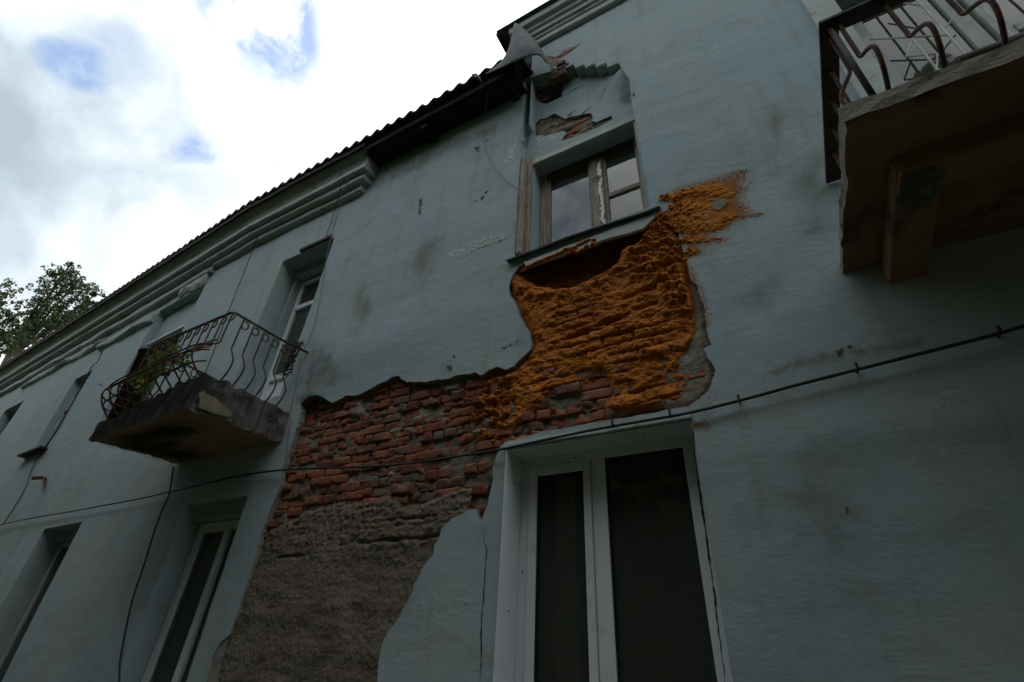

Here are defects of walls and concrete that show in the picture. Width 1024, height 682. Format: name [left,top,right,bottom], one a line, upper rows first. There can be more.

spalling [529,43,580,104]
spalling [519,114,612,148]
peeling [597,162,605,224]
spalling [524,223,653,290]
flaking render [207,284,715,682]
crack [479,524,487,674]